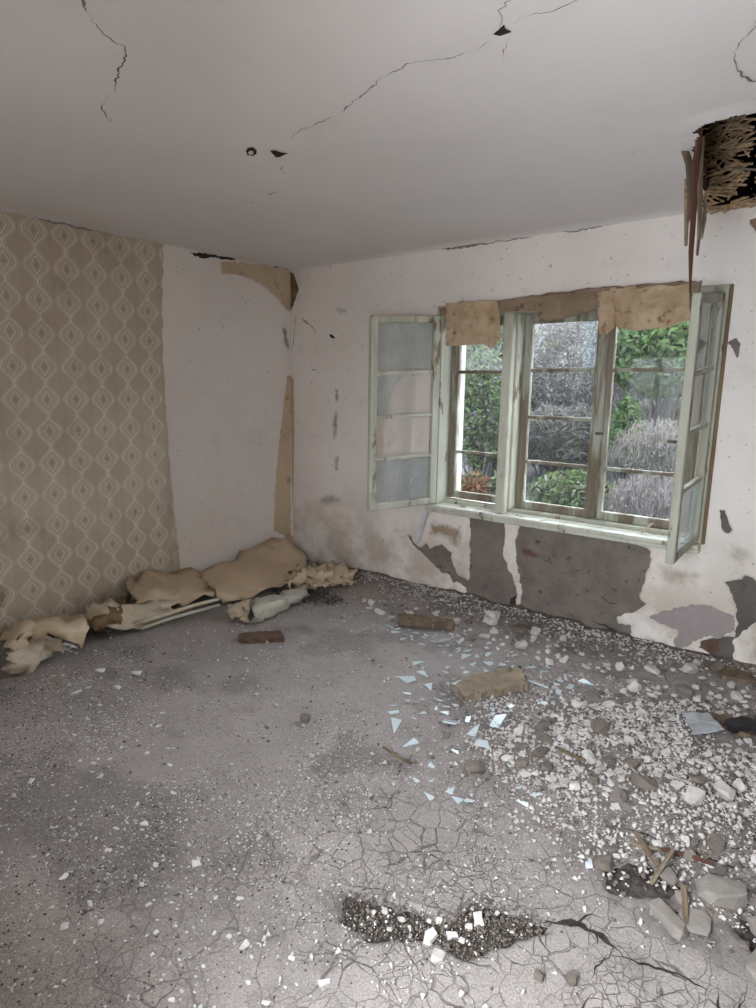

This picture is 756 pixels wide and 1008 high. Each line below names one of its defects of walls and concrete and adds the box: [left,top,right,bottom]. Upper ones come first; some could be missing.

crack [81,0,127,125]
crack [292,0,577,137]
crack [734,27,756,82]
spalling [408,518,651,634]
peeling [650,575,756,658]
crack [621,818,756,875]
crack [543,914,745,1008]